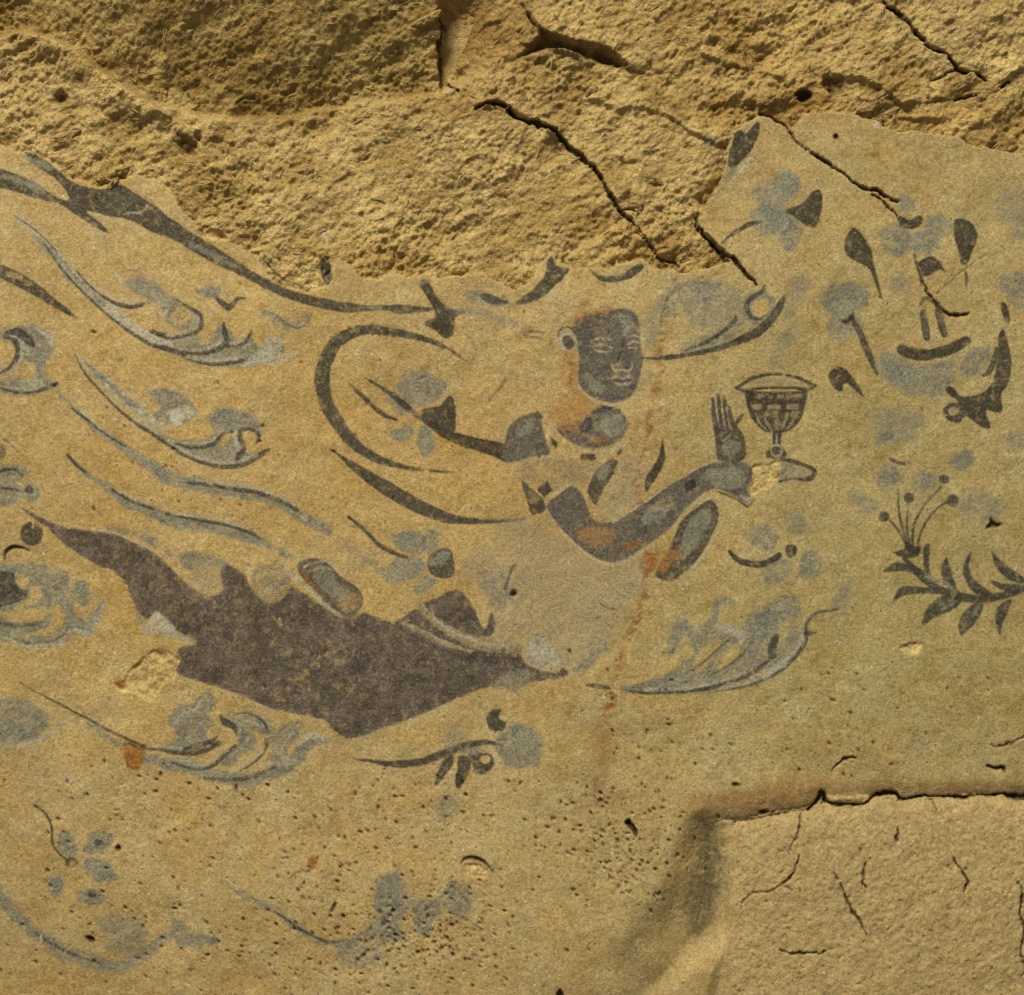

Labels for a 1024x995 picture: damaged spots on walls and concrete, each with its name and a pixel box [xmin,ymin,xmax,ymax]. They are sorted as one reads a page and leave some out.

crack [882,0,1013,103]
flaking render [0,0,1024,298]
crack [434,8,681,269]
crack [757,110,895,217]
crack [692,210,759,287]
crack [923,249,993,319]
leakage [585,763,1024,995]
flaking render [820,788,883,813]
crack [740,753,1024,906]